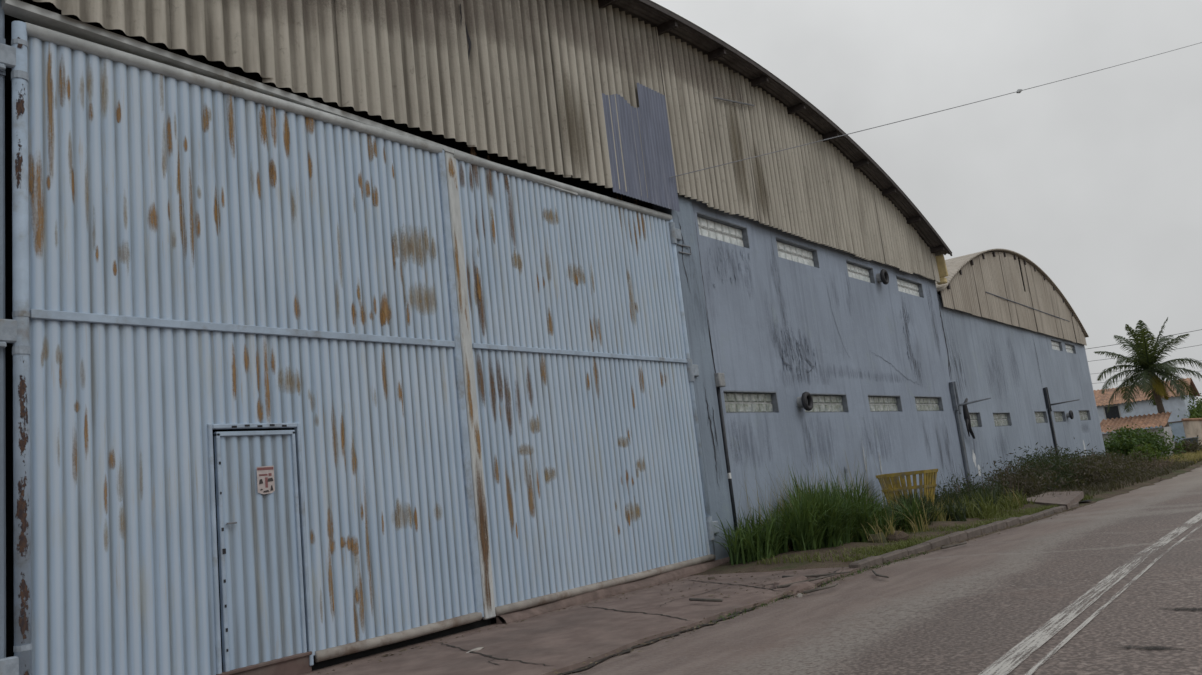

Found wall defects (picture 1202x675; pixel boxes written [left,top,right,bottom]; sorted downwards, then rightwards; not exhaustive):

corrosion [28,52,70,253]
corrosion [149,119,200,255]
corrosion [214,192,224,232]
corrosion [257,162,276,196]
corrosion [260,107,289,154]
corrosion [449,147,521,268]
corrosion [337,288,391,325]
corrosion [455,240,486,334]
corrosion [232,346,275,420]
corrosion [332,418,357,473]
corrosion [466,359,548,607]
corrosion [328,507,384,641]